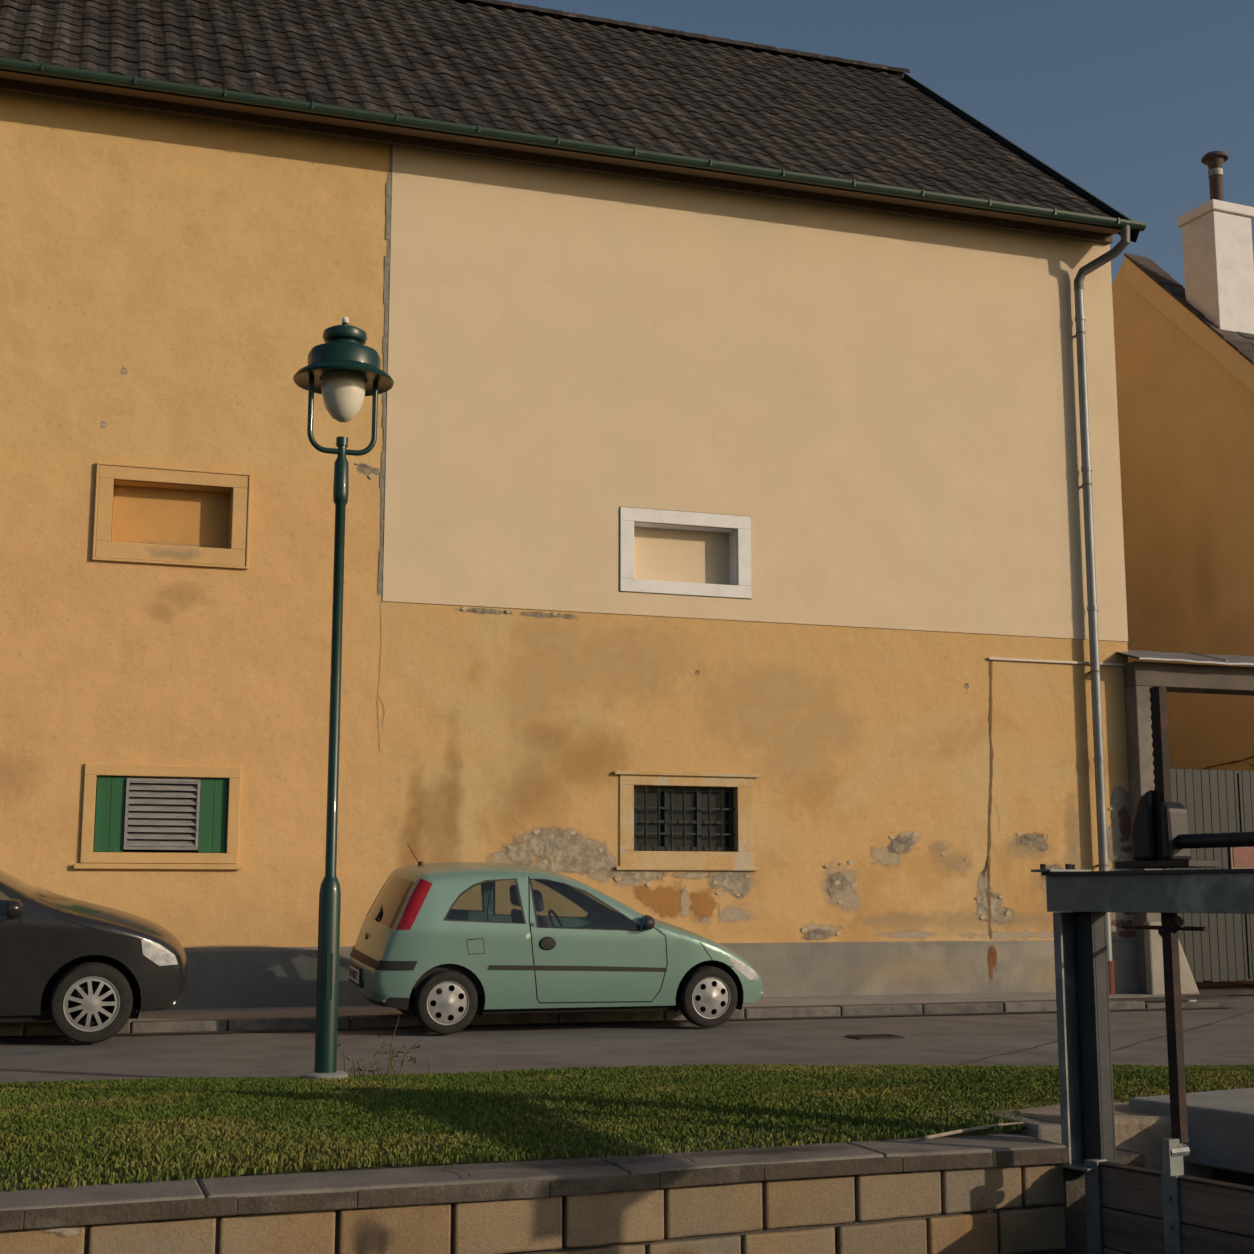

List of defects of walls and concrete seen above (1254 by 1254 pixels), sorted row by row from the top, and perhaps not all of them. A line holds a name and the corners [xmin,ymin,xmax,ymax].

crack [981,660,1000,939]
spalling [872,832,921,866]
spalling [1016,832,1048,851]
spalling [1107,786,1132,871]
spalling [490,828,750,921]
spalling [824,860,860,909]
spalling [976,874,1013,924]
spalling [801,924,841,940]
rust [988,946,997,977]